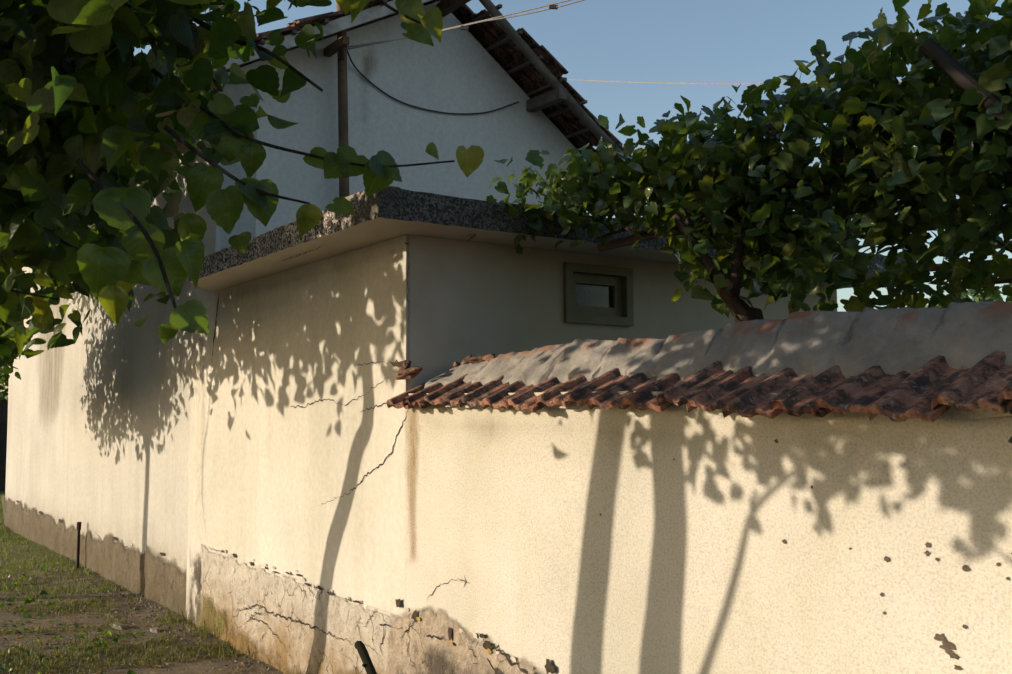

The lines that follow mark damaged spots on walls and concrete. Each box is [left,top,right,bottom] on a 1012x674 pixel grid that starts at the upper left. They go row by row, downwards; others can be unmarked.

crack [290,360,408,506]
spalling [1,495,187,617]
spalling [201,544,555,674]